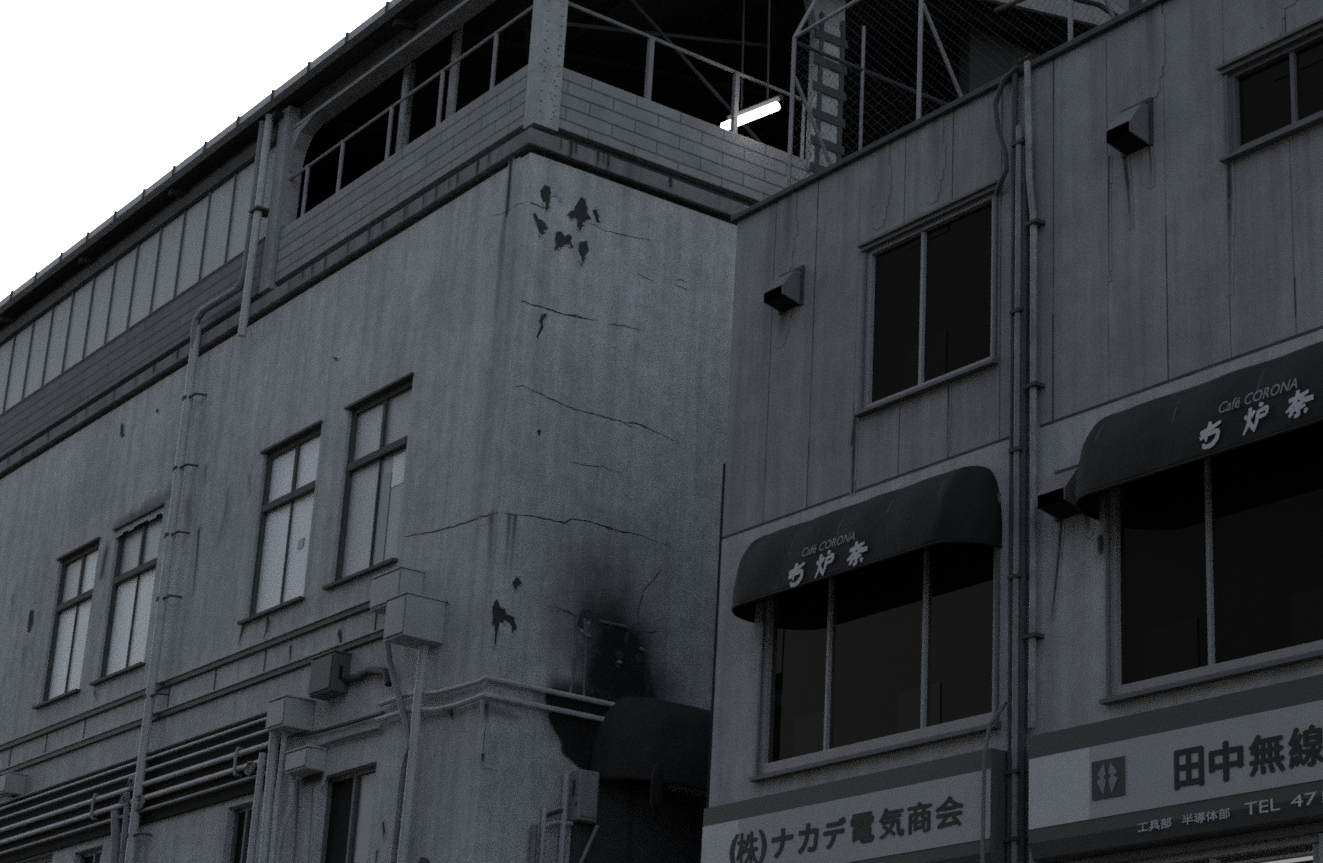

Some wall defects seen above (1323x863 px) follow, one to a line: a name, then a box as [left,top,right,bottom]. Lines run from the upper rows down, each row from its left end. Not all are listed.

spalling [532,184,602,267]
crack [518,299,642,331]
crack [516,385,679,443]
spalling [512,574,523,593]
crack [403,512,669,634]
spalling [491,598,517,651]